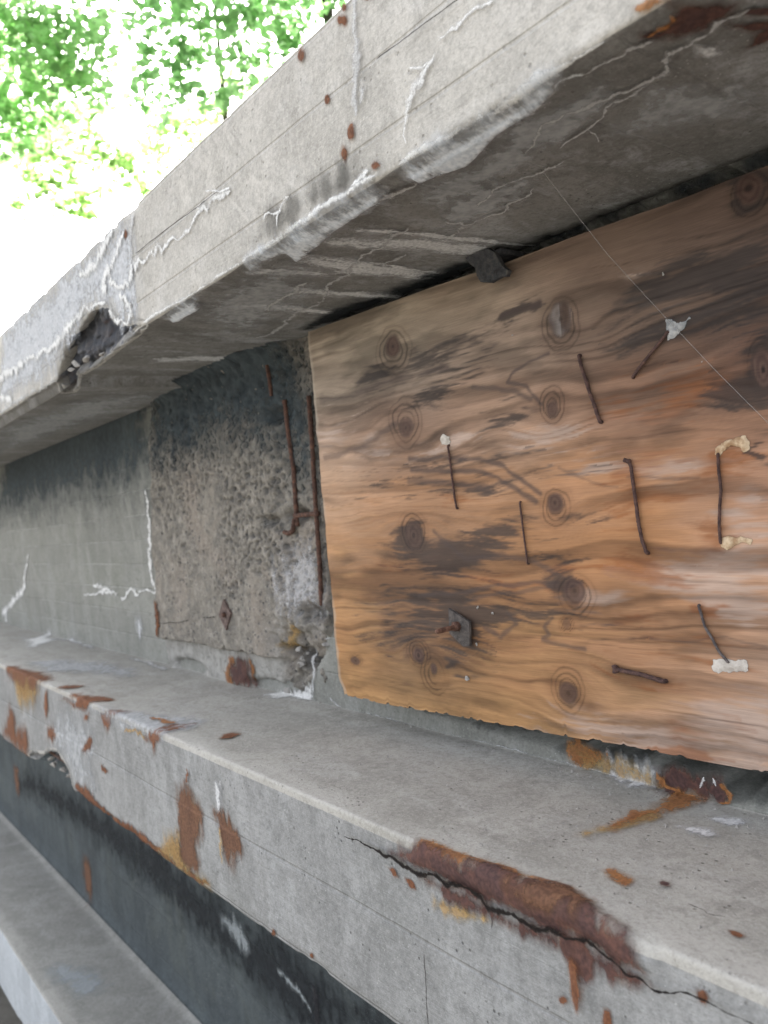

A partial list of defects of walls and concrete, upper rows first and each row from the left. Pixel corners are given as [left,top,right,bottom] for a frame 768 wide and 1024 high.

crack [444,10,749,238]
crack [130,187,230,272]
spalling [54,302,149,394]
crack [84,491,156,601]
leakage [0,341,309,510]
spalling [148,336,334,703]
rust [265,365,324,606]
rust [3,666,125,756]
rust [75,769,241,885]
leakage [19,775,382,1024]
rust [390,839,644,1012]
crack [346,837,753,1024]